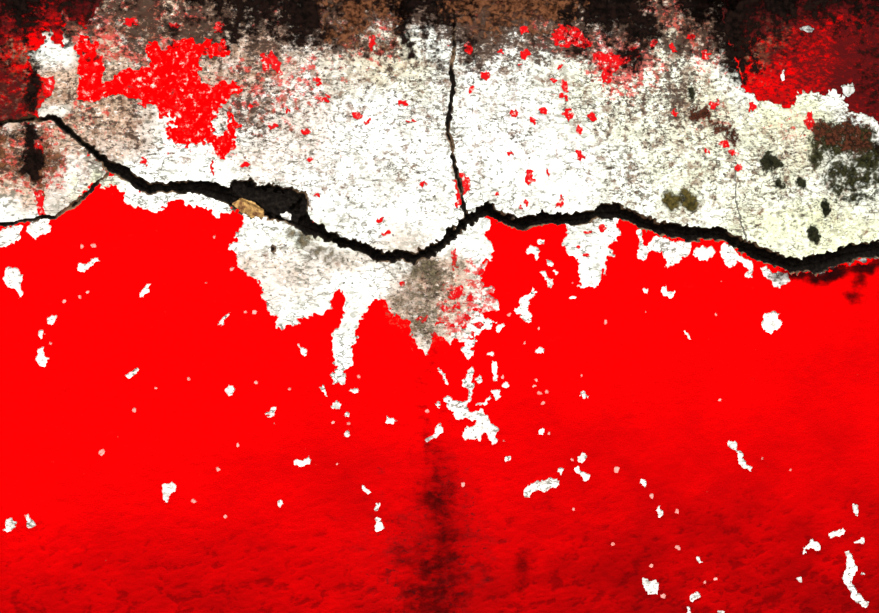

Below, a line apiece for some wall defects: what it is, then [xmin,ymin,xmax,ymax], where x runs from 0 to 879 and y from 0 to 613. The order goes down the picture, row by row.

crack [0,114,233,227]
peeling [0,0,879,445]
crack [306,6,879,276]
peeling [524,452,590,498]
peeling [842,537,869,608]